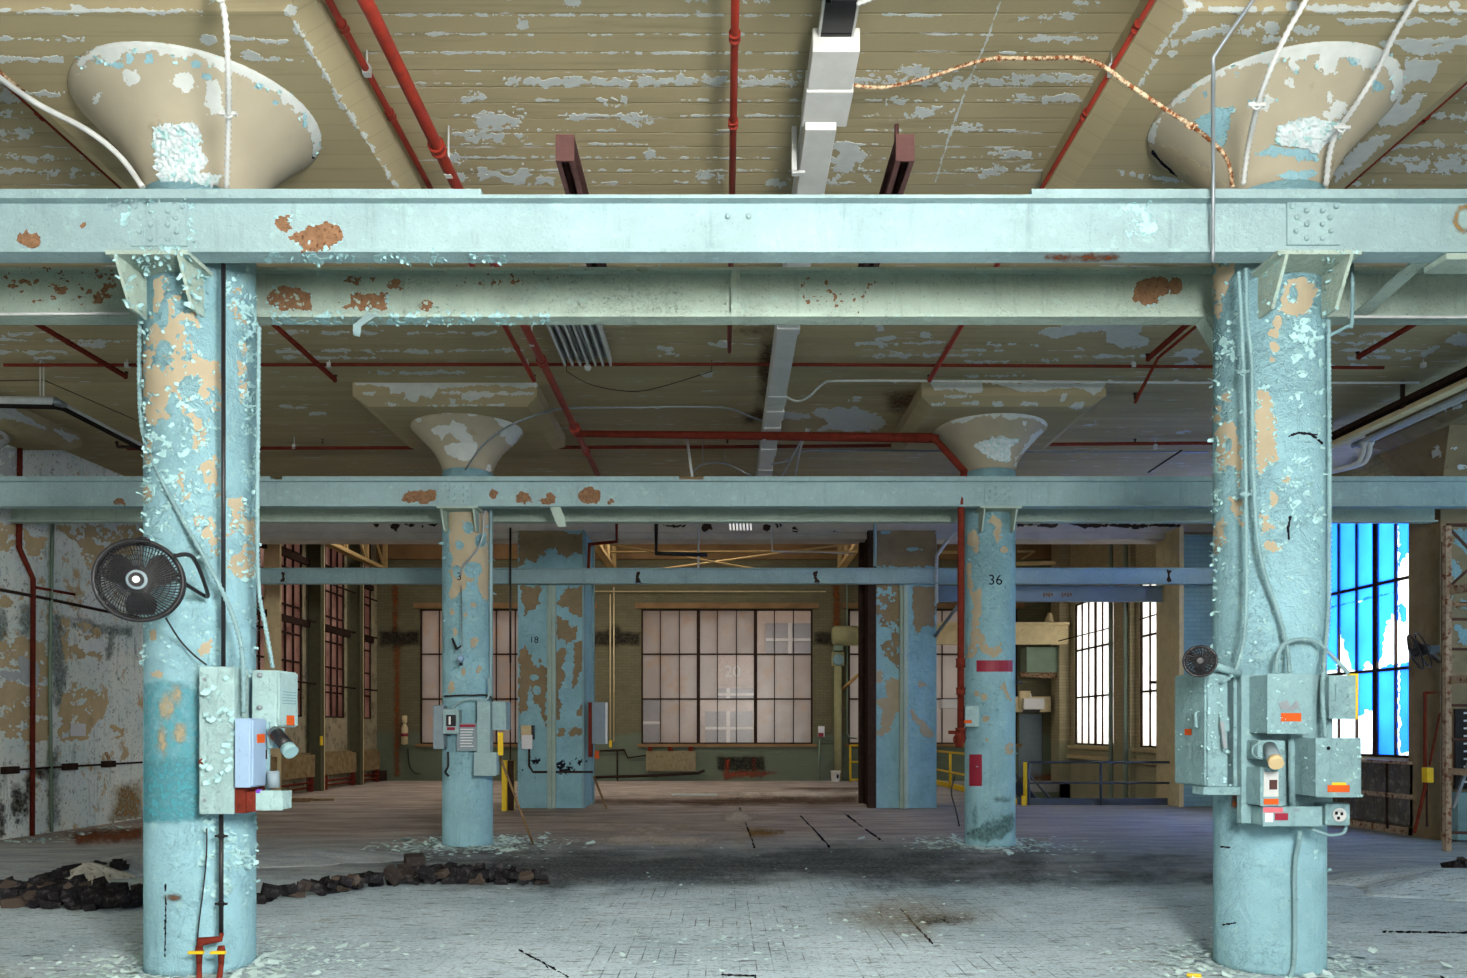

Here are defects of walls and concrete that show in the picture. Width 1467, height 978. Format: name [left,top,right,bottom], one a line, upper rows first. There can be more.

peeling [0,4,399,189]
peeling [826,63,1094,186]
peeling [1117,0,1467,187]
corrosion [265,285,313,312]
corrosion [273,214,344,256]
corrosion [338,276,404,311]
corrosion [1132,276,1184,308]
peeling [855,263,1238,469]
peeling [1209,277,1467,587]
peeling [0,251,551,846]
corrosion [402,489,437,505]
corrosion [578,486,614,505]